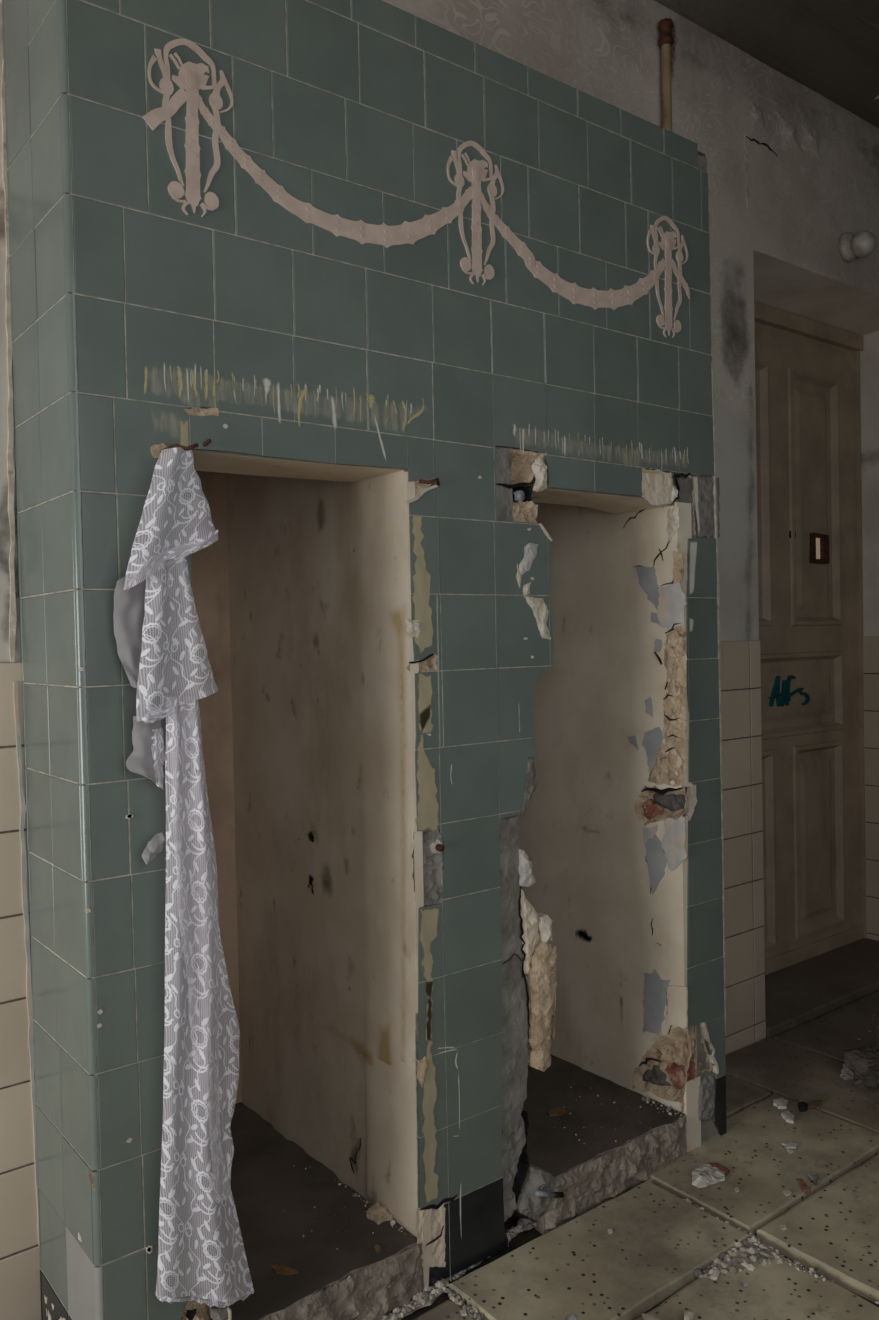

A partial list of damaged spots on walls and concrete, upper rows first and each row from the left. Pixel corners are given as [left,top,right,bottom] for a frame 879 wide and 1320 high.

spalling [478,448,553,640]
peeling [628,468,720,894]
spalling [262,478,458,1320]
spalling [500,758,719,1231]
spalling [181,1294,232,1320]